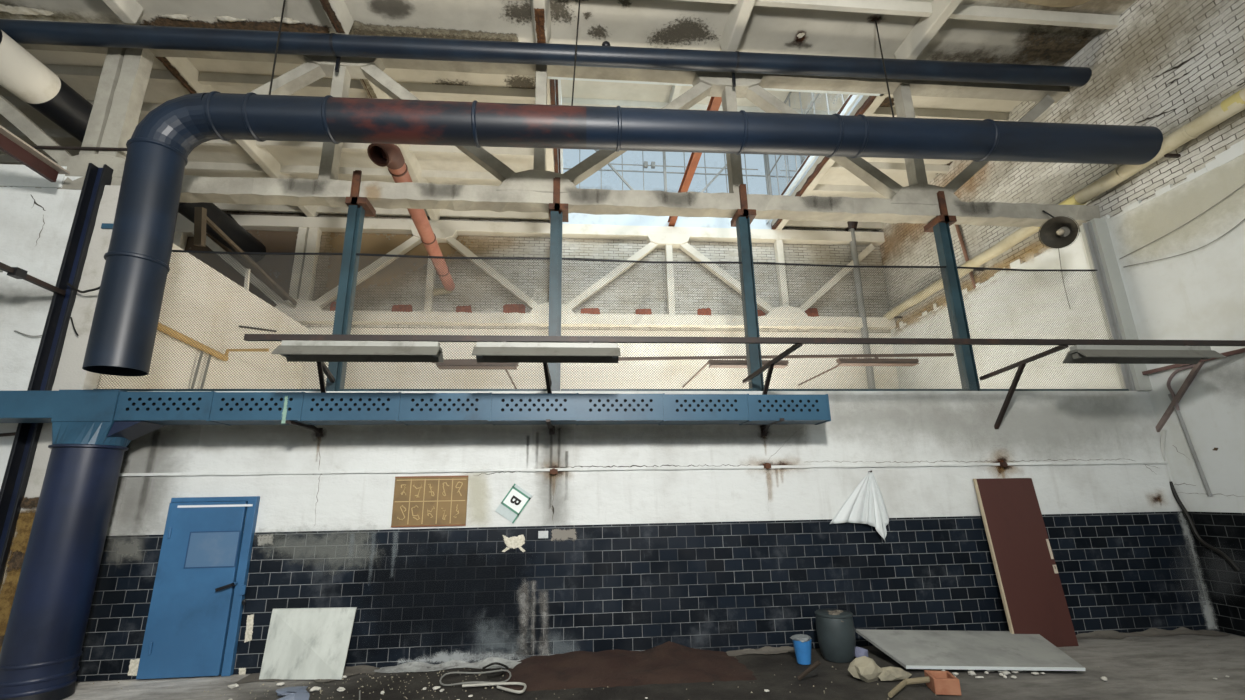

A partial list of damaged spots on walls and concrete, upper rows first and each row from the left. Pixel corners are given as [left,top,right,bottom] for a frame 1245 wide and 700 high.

water stain [649,16,721,49]
water stain [932,28,1097,66]
water stain [1010,0,1131,14]
crack [3,186,46,245]
water stain [1179,513,1217,629]
water stain [374,582,549,673]